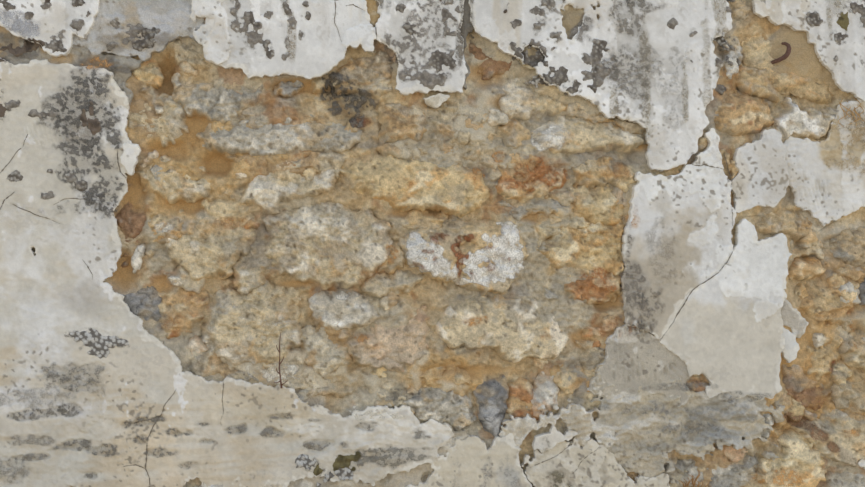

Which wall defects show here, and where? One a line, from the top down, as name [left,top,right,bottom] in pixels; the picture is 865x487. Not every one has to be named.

crack [334,0,377,42]
spalling [104,0,660,457]
spalling [621,0,865,487]
crack [660,252,733,341]
peeling [7,404,79,421]
peeling [0,435,117,478]
crack [123,390,176,484]